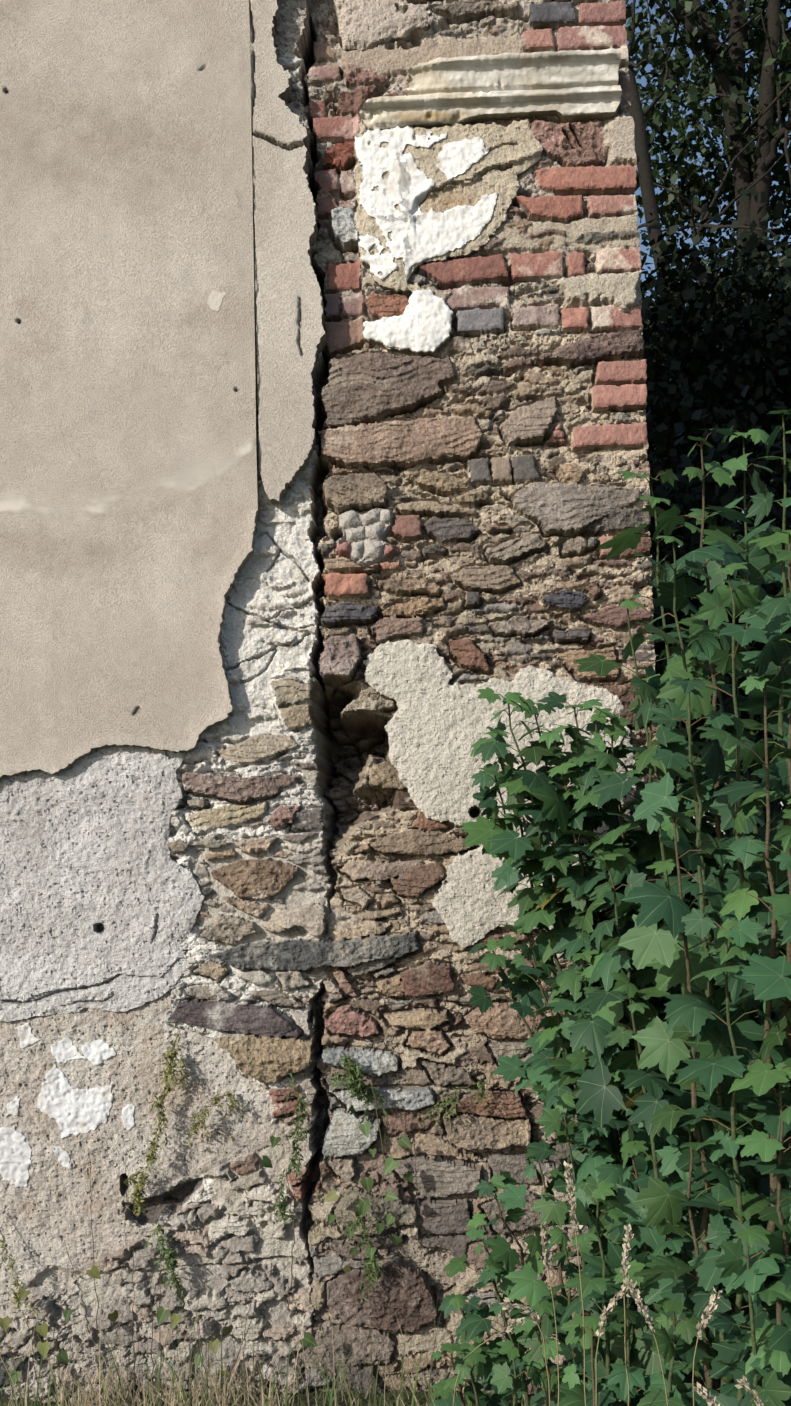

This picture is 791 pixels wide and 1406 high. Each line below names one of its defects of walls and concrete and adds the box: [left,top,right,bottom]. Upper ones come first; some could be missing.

crack [250,3,322,473]
crack [226,266,330,688]
crack [1,974,122,1007]
spalling [0,90,420,1401]
crack [159,983,331,1328]
crack [325,860,339,914]